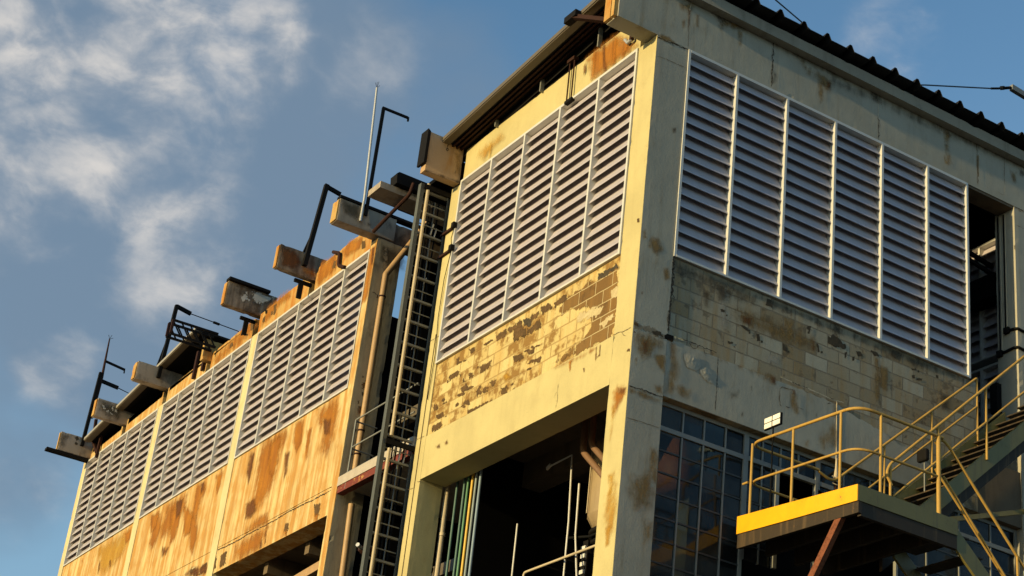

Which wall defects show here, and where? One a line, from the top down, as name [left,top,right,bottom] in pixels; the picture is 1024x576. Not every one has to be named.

corrosion [584,37,631,78]
corrosion [282,238,375,302]
spalling [215,291,290,364]
peeling [432,263,618,432]
damp [741,298,856,349]
corrosion [149,474,222,556]
corrosion [235,400,337,559]
corrosion [606,476,615,545]